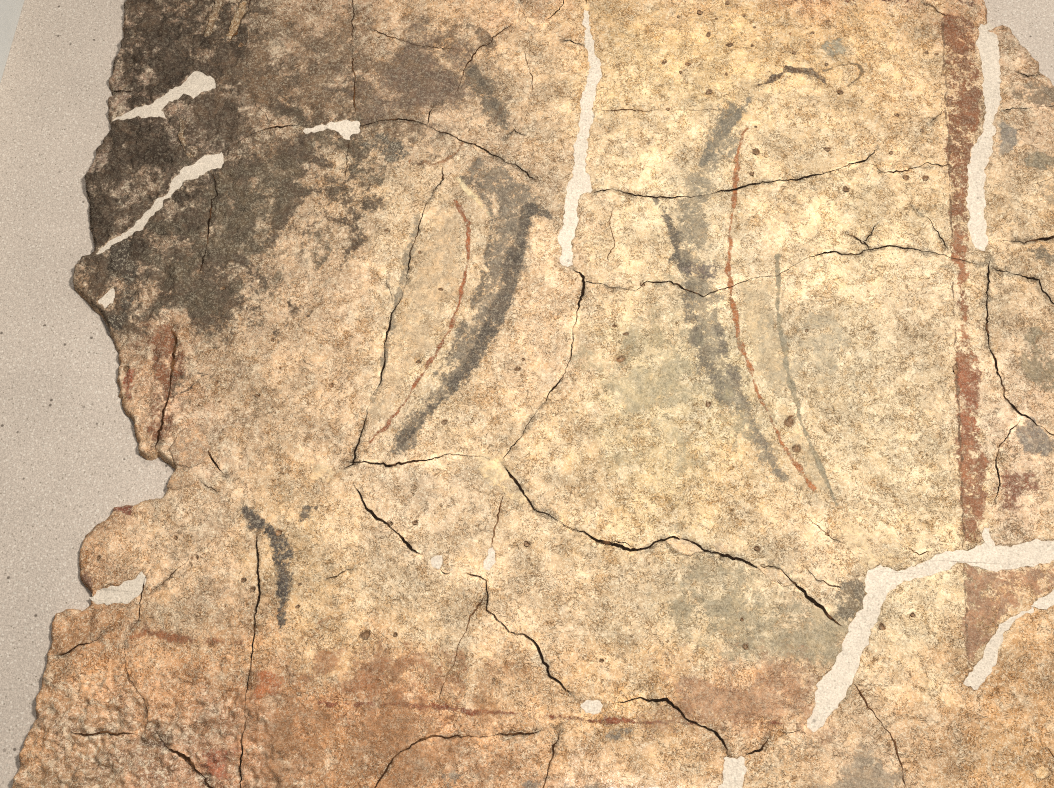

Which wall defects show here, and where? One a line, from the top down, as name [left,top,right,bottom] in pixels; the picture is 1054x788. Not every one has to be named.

crack [345,0,587,179]
crack [200,171,218,274]
crack [596,148,950,257]
crack [155,329,178,448]
crack [344,167,1054,626]
crack [51,634,102,656]
crack [71,562,213,788]
crack [239,536,261,788]
crack [374,722,564,788]
crack [440,570,574,700]
crack [619,697,802,756]
crack [856,686,906,786]